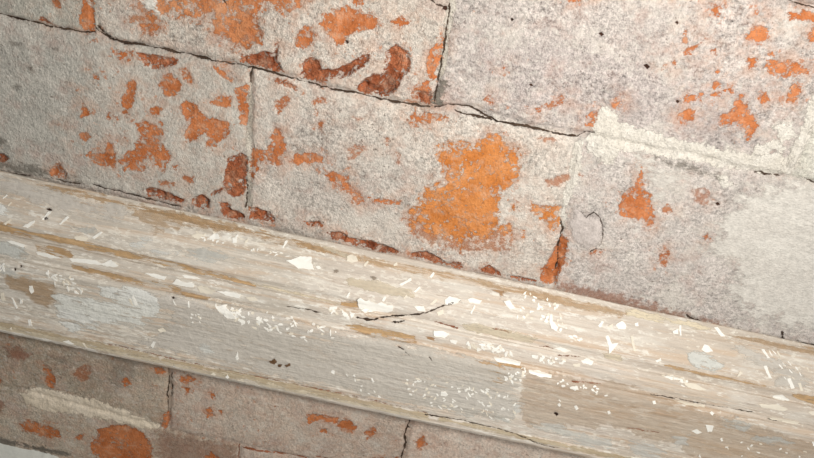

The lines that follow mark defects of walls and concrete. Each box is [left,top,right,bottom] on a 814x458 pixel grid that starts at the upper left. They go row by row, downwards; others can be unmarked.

peeling [112,50,250,151]
peeling [124,0,302,114]
crack [0,0,595,137]
spalling [300,52,372,82]
peeling [295,0,411,49]
spalling [354,44,411,97]
peeling [677,70,759,141]
spalling [42,106,331,270]
peeling [409,133,526,250]
spalling [304,221,401,267]
spalling [481,203,569,285]
peeling [392,331,608,420]